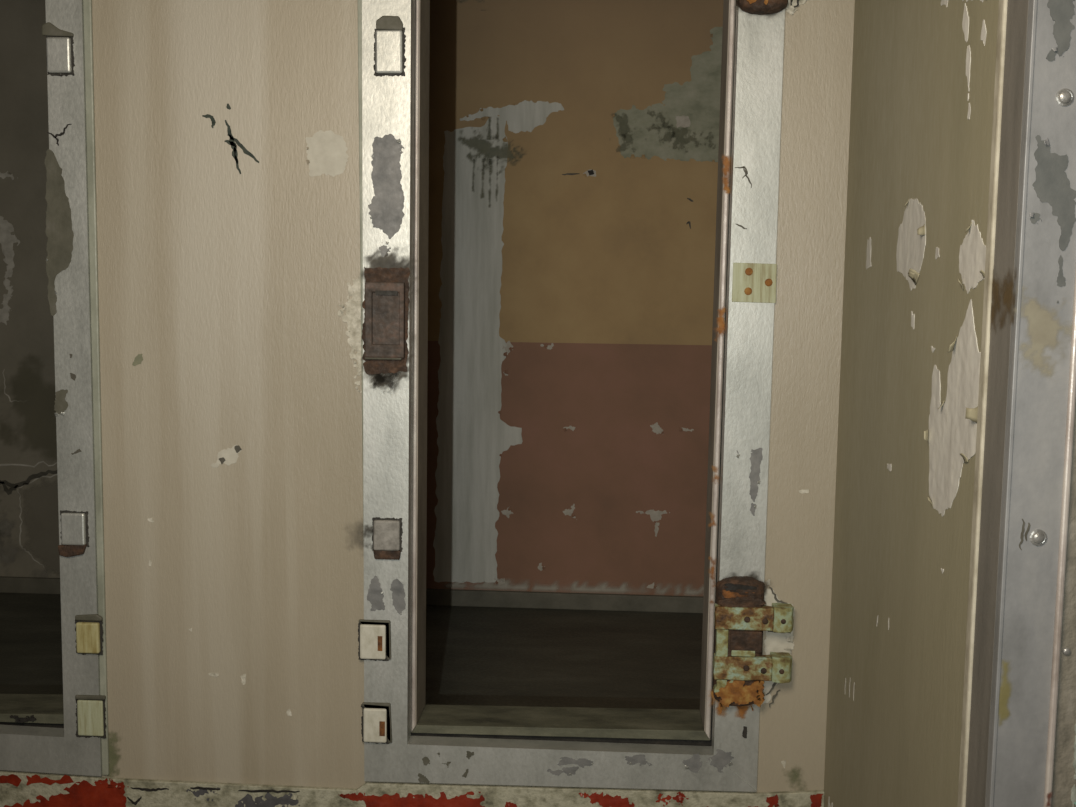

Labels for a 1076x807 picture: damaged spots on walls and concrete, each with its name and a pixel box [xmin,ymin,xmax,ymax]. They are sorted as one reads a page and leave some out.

peeling [612,27,723,162]
peeling [962,0,987,119]
peeling [1046,0,1075,61]
peeling [368,134,405,257]
peeling [896,198,940,290]
peeling [1029,135,1076,287]
peeling [433,100,564,590]
peeling [924,220,986,517]
crack [0,461,58,567]
peeling [0,774,129,807]
peeling [338,753,485,807]
peeling [579,792,635,807]